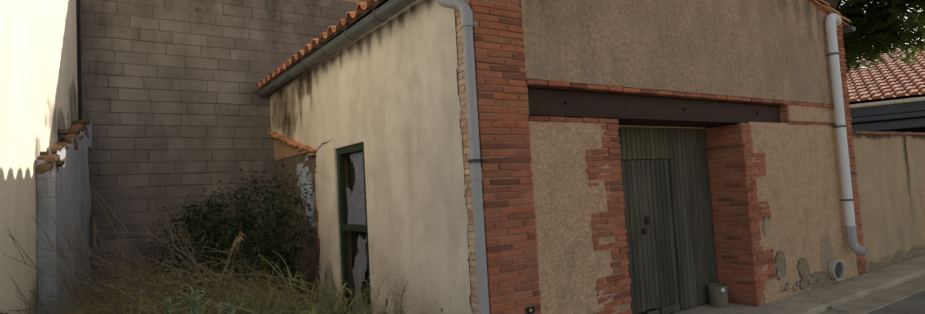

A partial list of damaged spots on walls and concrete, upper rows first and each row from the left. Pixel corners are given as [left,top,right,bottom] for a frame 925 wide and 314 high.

water stain [272,56,334,138]
spalling [35,119,91,173]
flaking render [275,151,321,306]
flaking render [775,251,828,292]